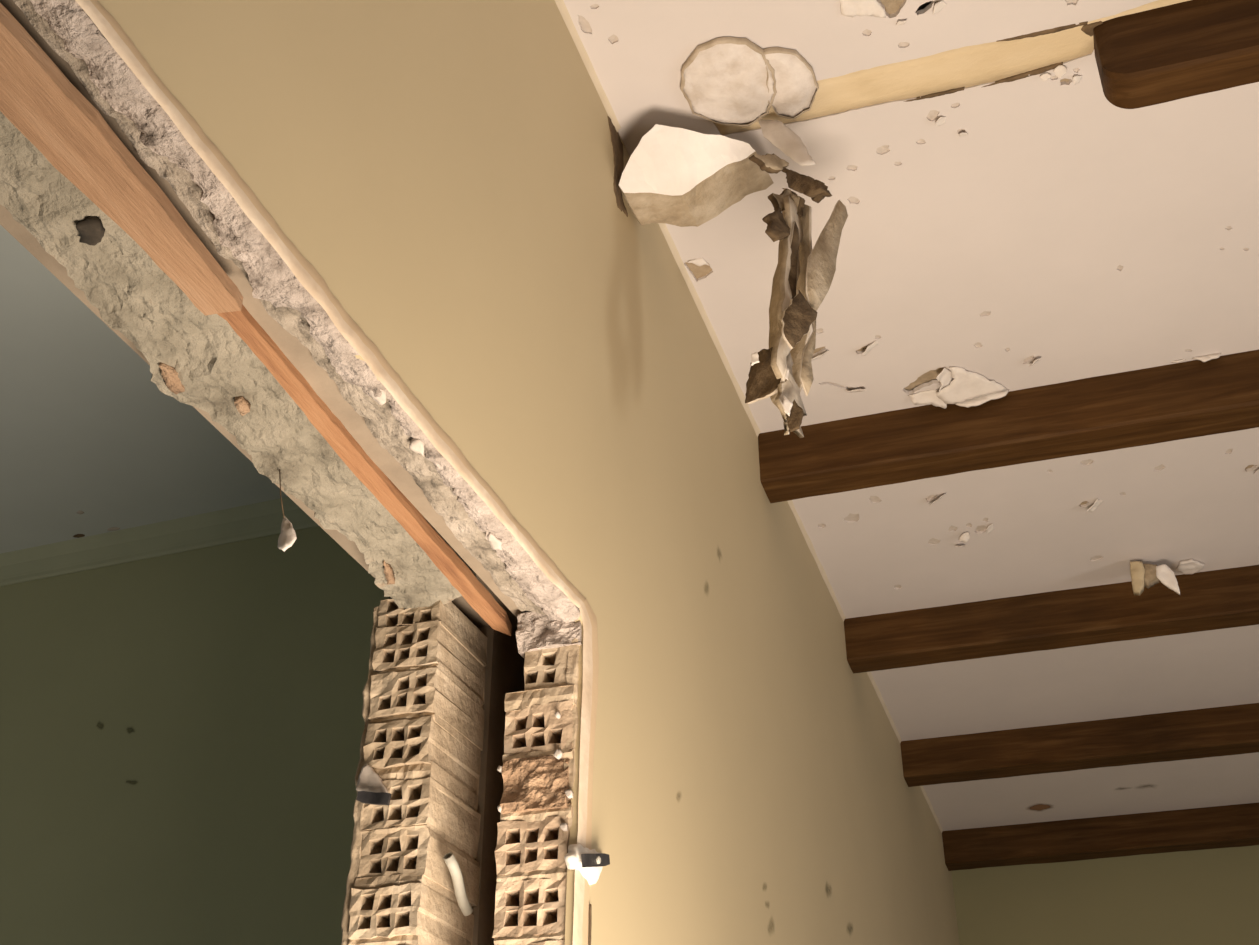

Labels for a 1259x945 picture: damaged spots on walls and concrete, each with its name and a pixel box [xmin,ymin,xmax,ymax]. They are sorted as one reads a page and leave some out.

flaking render [714,0,1190,136]
spalling [607,116,628,217]
flaking render [685,258,712,279]
flaking render [75,0,599,850]
flaking render [904,367,1009,409]
flaking render [572,869,590,945]